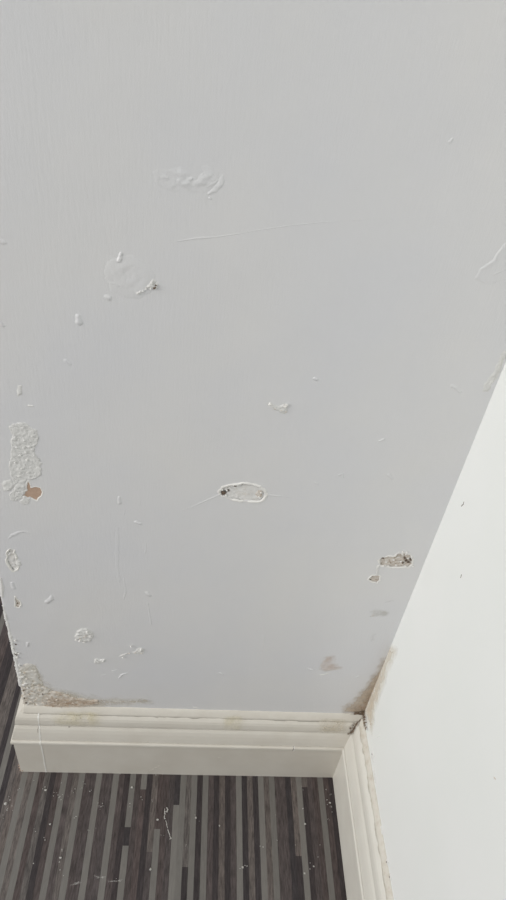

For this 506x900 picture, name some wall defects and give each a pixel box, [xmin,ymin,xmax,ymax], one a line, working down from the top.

peeling [22,480,44,502]
flaking render [217,482,268,503]
flaking render [367,551,414,584]
flaking render [0,577,99,708]
leakage [324,672,383,734]